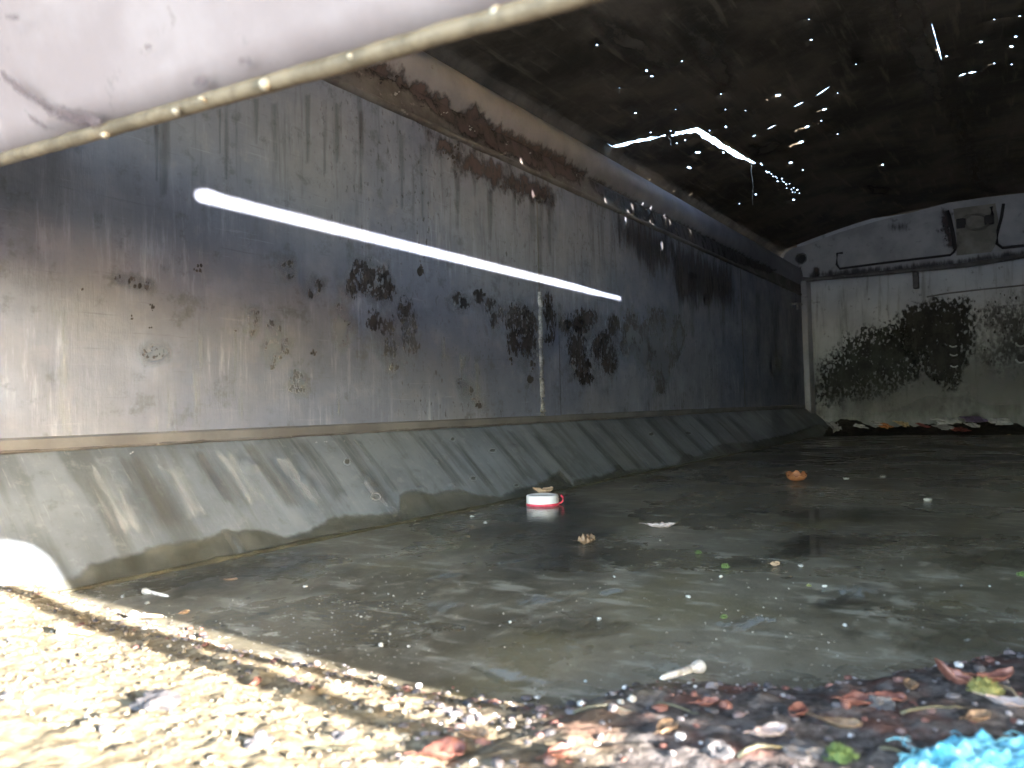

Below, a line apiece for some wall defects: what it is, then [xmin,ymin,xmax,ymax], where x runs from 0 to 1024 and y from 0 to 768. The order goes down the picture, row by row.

corrosion [364,62,776,274]
leakage [618,213,734,304]
leakage [815,293,1024,422]